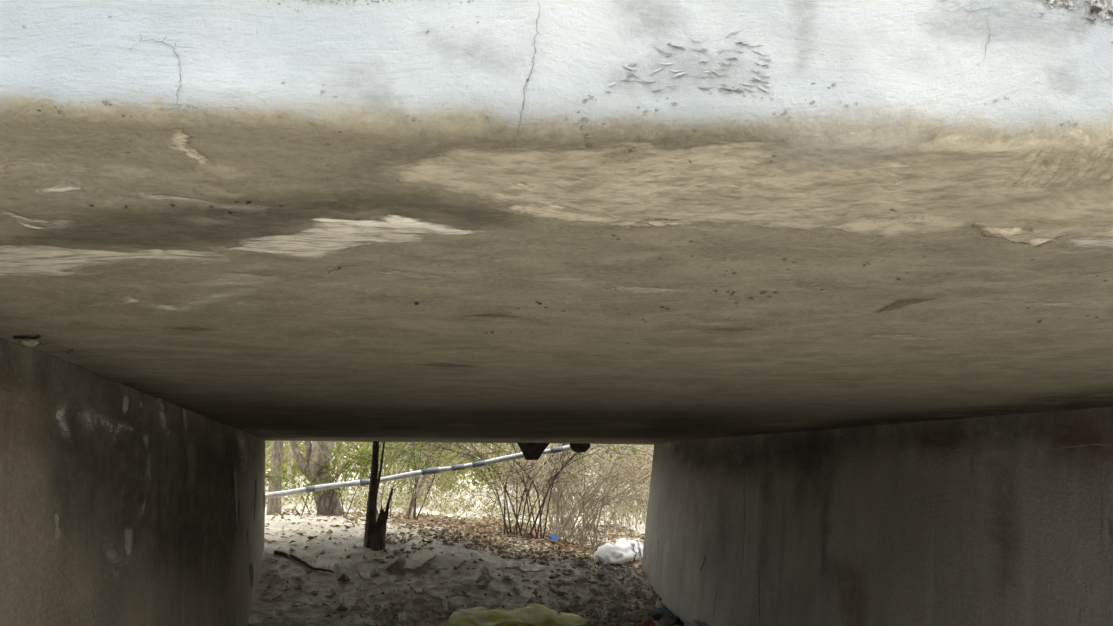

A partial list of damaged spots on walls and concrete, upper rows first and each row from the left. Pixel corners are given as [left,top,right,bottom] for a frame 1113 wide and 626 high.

spalling [1043,0,1113,25]
crack [129,34,181,104]
crack [514,4,541,146]